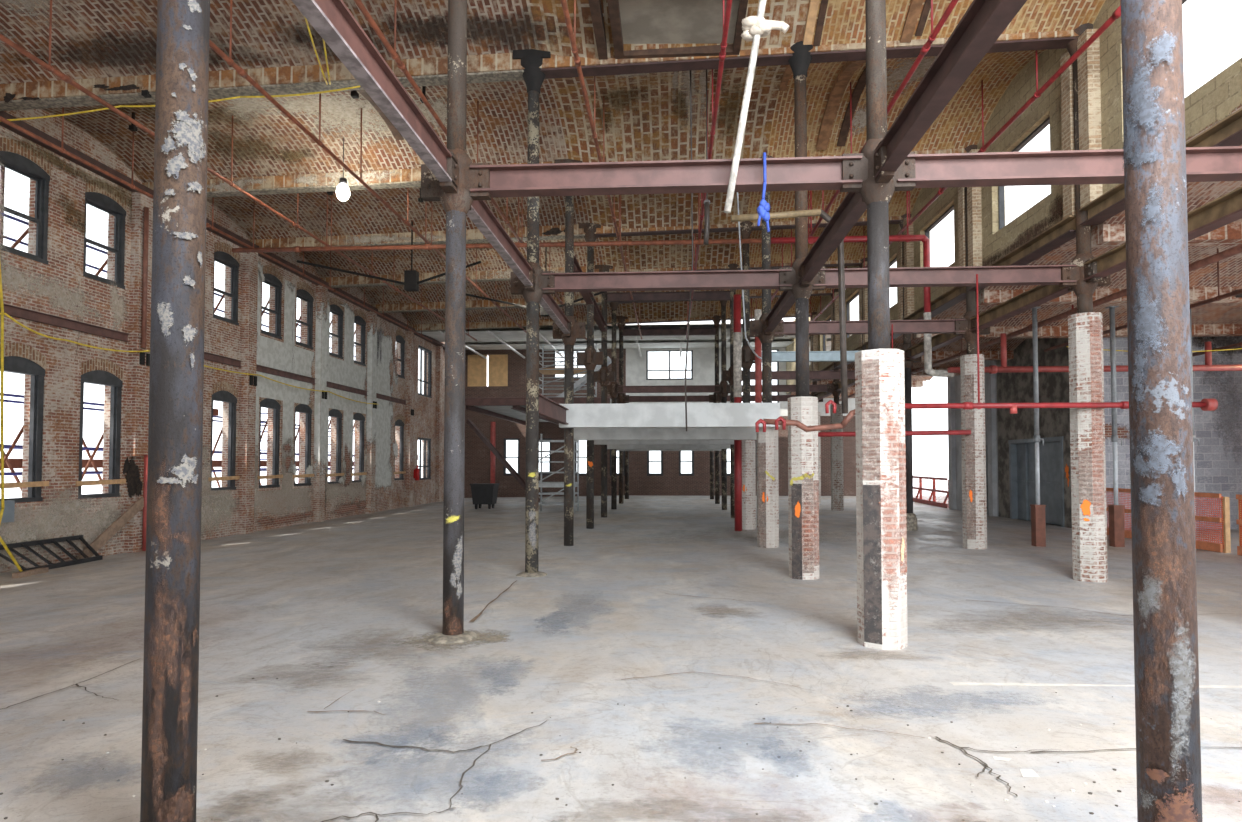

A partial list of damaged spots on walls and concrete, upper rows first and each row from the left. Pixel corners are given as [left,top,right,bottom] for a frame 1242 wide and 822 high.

peeling [182,0,202,30]
peeling [1122,27,1177,170]
peeling [161,92,206,195]
peeling [170,232,203,288]
peeling [155,302,198,368]
peeling [1078,320,1188,515]
peeling [122,453,199,498]
peeling [449,533,463,598]
corrosion [147,582,197,822]
crack [307,690,546,822]
crack [754,723,1136,796]
corrosion [1145,768,1201,822]